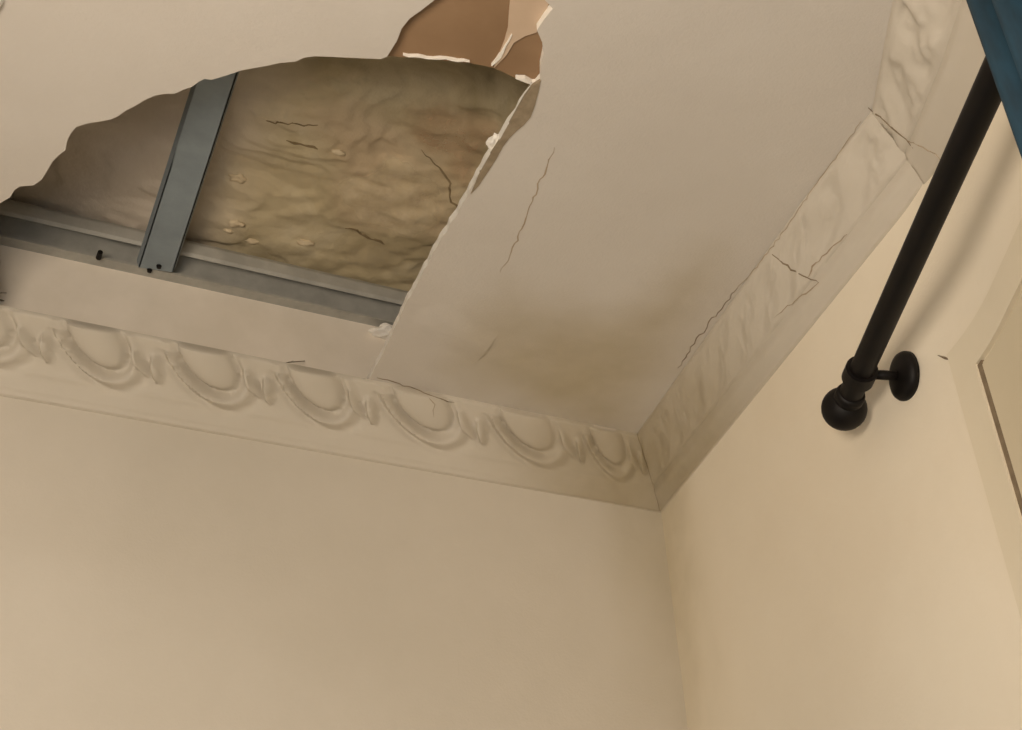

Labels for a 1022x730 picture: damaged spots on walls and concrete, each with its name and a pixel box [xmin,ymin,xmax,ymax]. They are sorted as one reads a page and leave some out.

peeling [388,0,543,193]
spalling [368,323,393,340]
crack [500,152,554,272]
crack [679,107,940,367]